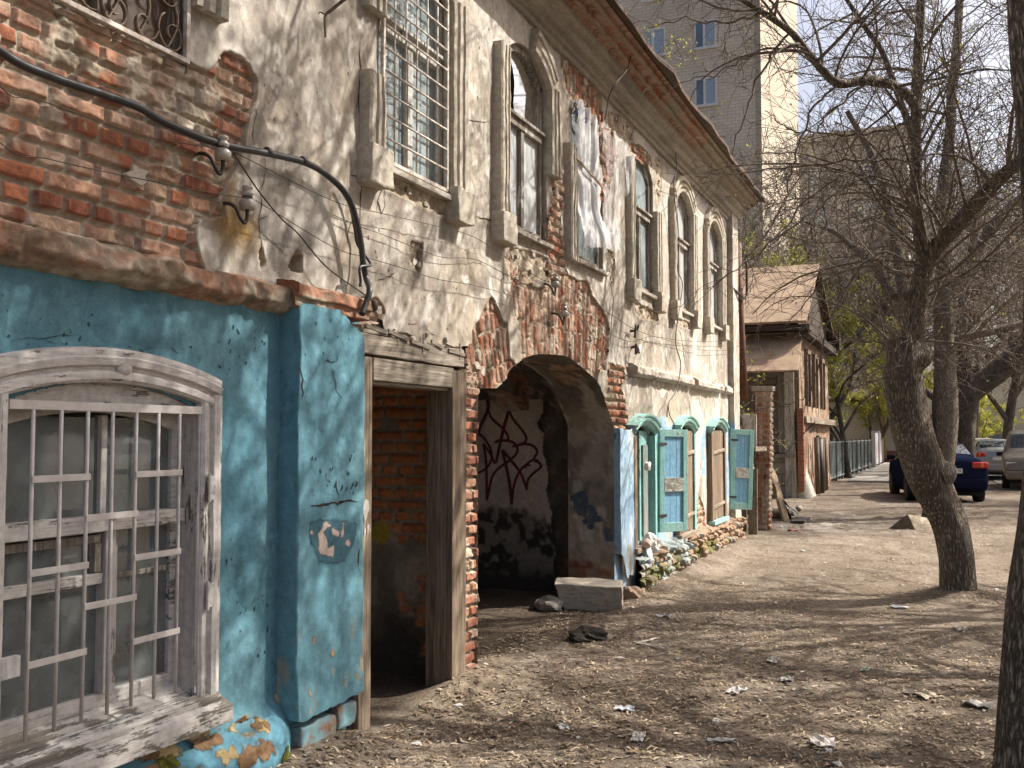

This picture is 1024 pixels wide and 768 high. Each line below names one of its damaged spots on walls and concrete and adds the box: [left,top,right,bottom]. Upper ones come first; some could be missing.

flaking render [0,0,266,269]
flaking render [561,55,662,204]
peeling [310,519,358,564]
crack [311,473,359,507]
flaking render [360,169,642,668]
peeling [135,715,277,768]